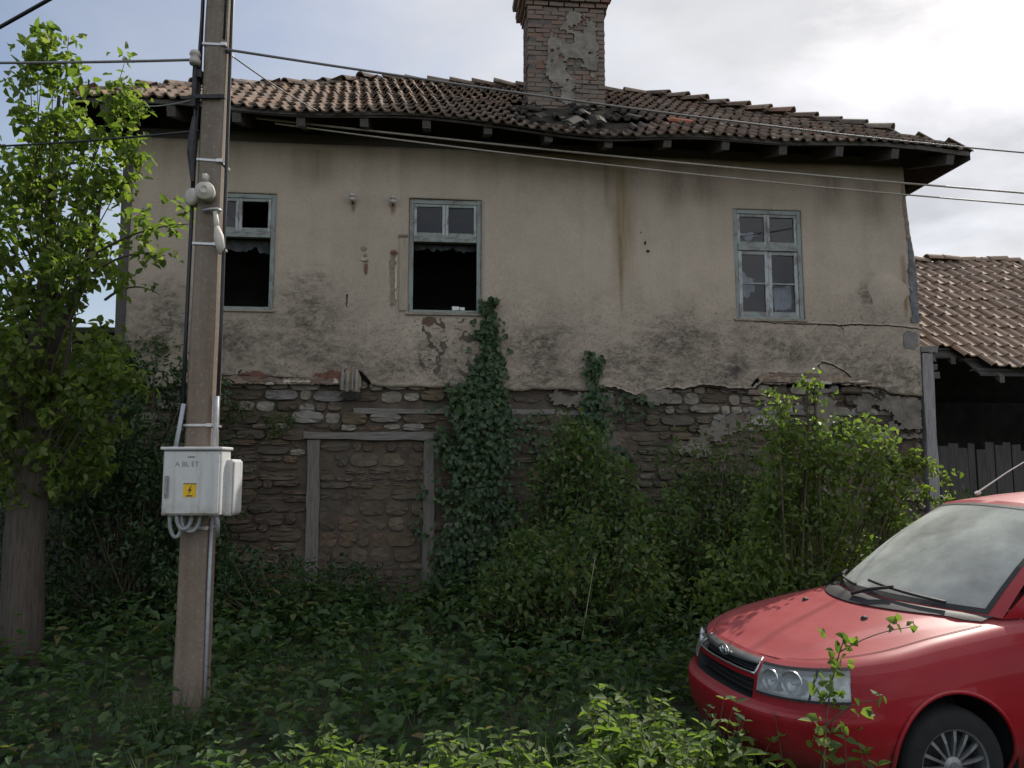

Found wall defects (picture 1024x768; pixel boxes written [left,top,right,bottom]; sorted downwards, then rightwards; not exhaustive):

peeling [389,249,398,306]
peeling [418,310,481,382]
crack [748,318,922,336]
spalling [221,369,341,386]
peeling [548,389,587,408]
peeling [676,372,923,458]